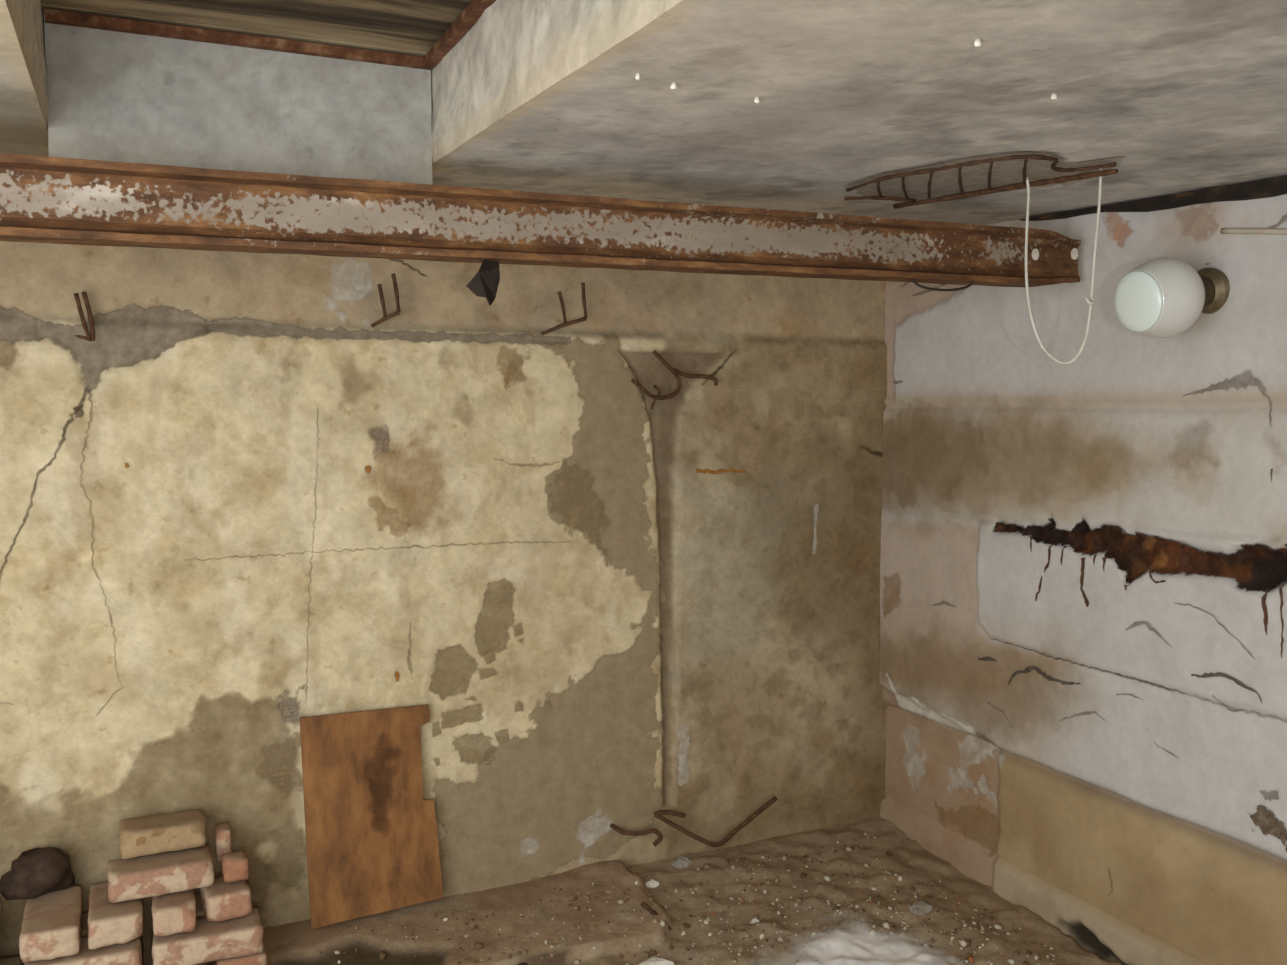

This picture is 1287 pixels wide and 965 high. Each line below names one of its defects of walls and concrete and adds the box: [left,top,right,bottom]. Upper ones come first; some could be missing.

spalling [845,152,1124,209]
crack [6,395,86,555]
flaking render [0,273,778,897]
corrosion [993,519,1287,658]